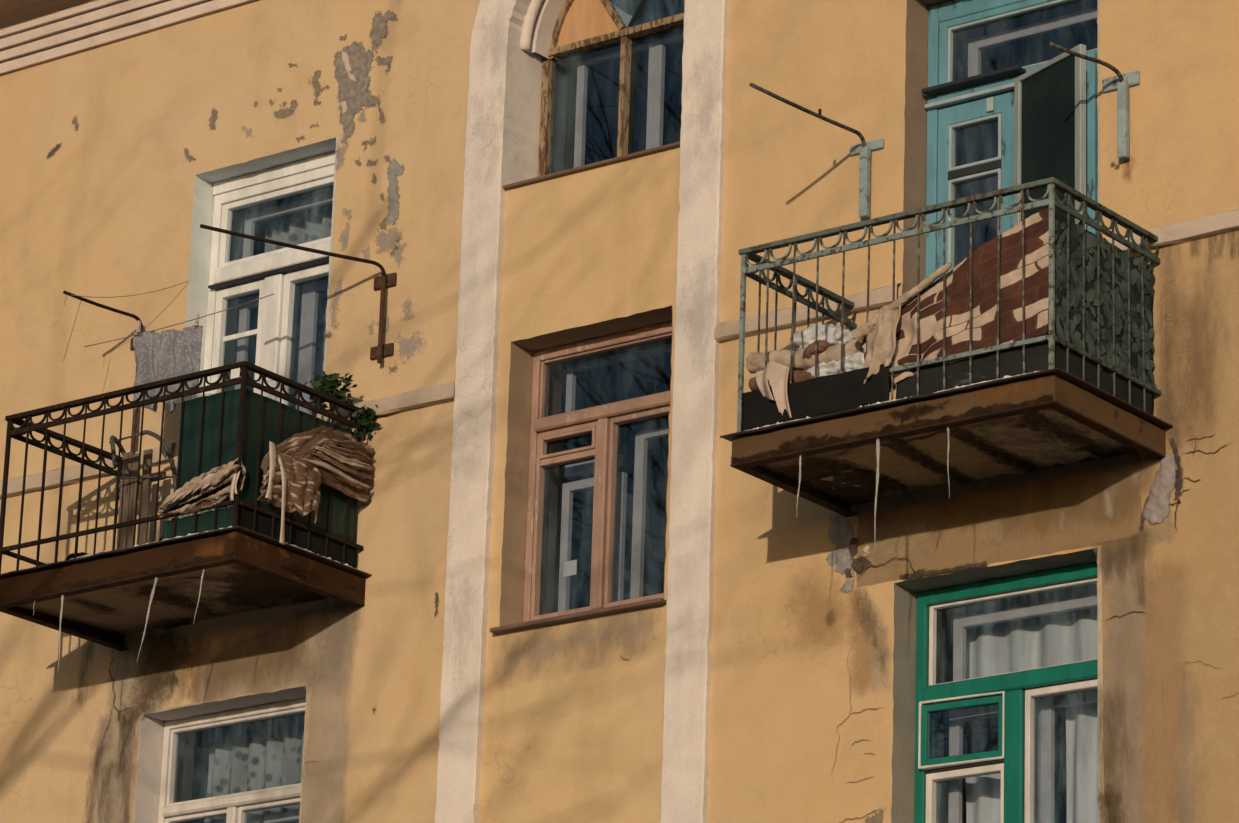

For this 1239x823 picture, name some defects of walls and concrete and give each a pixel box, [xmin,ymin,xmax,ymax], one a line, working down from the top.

peeling [209,108,218,130]
peeling [254,88,297,119]
peeling [308,10,406,266]
peeling [325,279,341,338]
peeling [368,300,427,374]
corrosion [731,382,1053,464]
spalling [774,409,1139,593]
spalling [1140,438,1183,537]
crack [1169,434,1228,531]
damp [123,564,356,823]
crack [831,635,881,783]
damp [1103,537,1145,823]